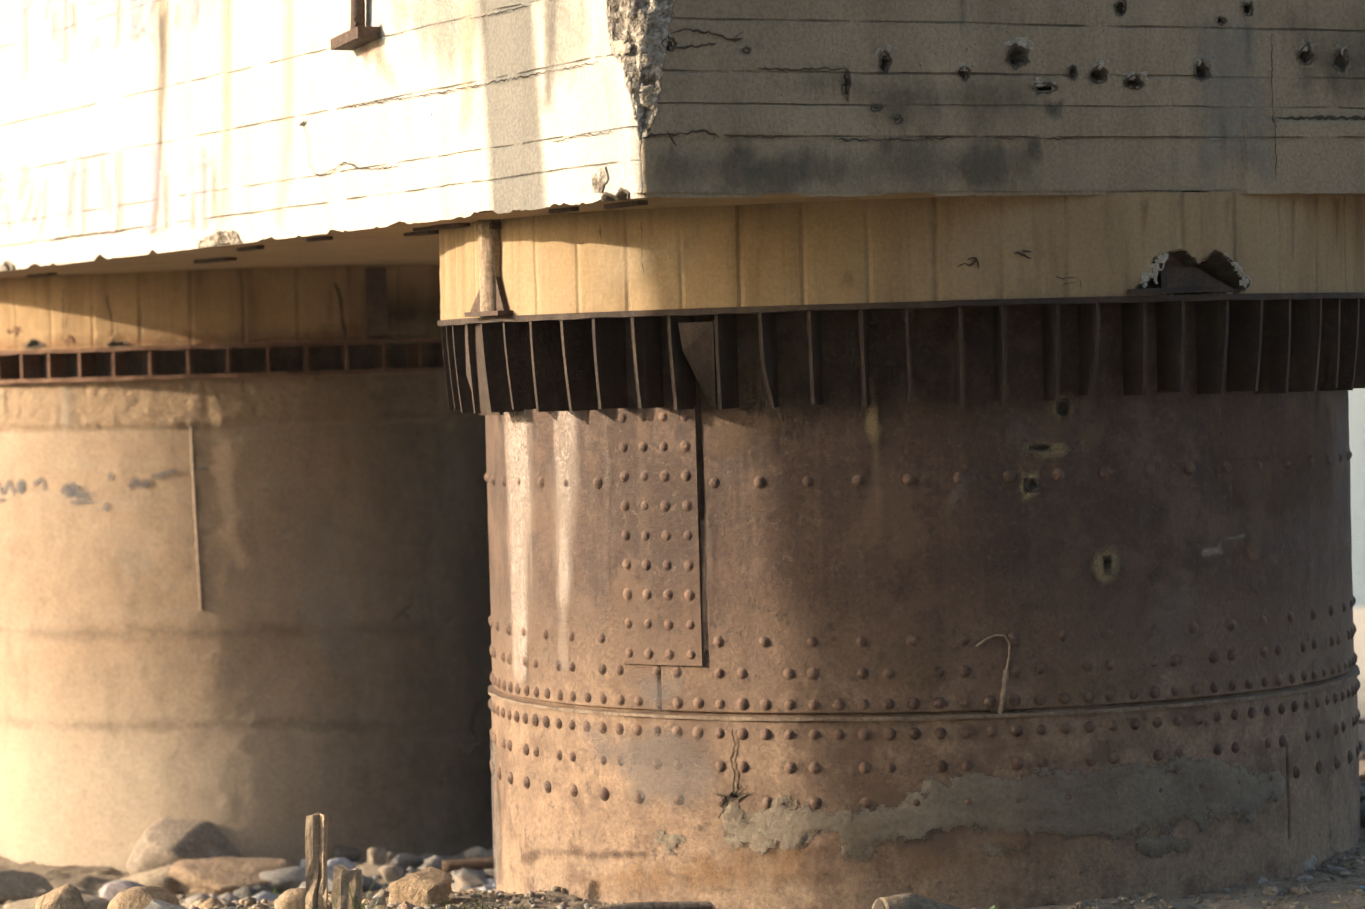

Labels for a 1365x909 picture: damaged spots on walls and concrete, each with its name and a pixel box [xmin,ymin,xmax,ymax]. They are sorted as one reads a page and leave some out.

spalling [606,0,678,145]
spalling [842,69,851,102]
spalling [875,44,897,73]
spalling [1003,37,1149,95]
spalling [1194,53,1216,82]
spalling [1296,39,1351,73]
spalling [1127,249,1252,295]
rust [865,323,879,443]
rust [1094,548,1118,583]
crack [716,729,748,819]